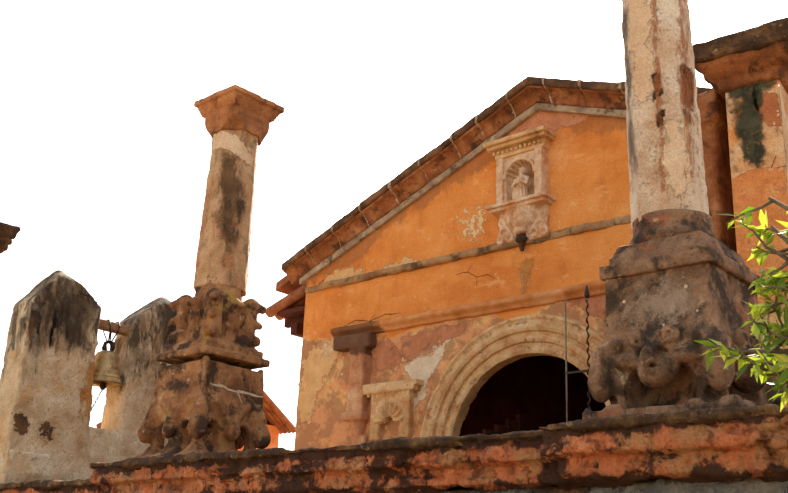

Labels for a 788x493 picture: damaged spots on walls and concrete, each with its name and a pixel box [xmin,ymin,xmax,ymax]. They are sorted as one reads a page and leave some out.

peeling [661,118,693,199]
water stain [728,80,776,165]
water stain [219,155,244,251]
peeling [454,199,487,242]
water stain [24,283,93,348]
crack [210,383,263,403]
peeling [372,322,466,411]
water stain [552,478,788,493]